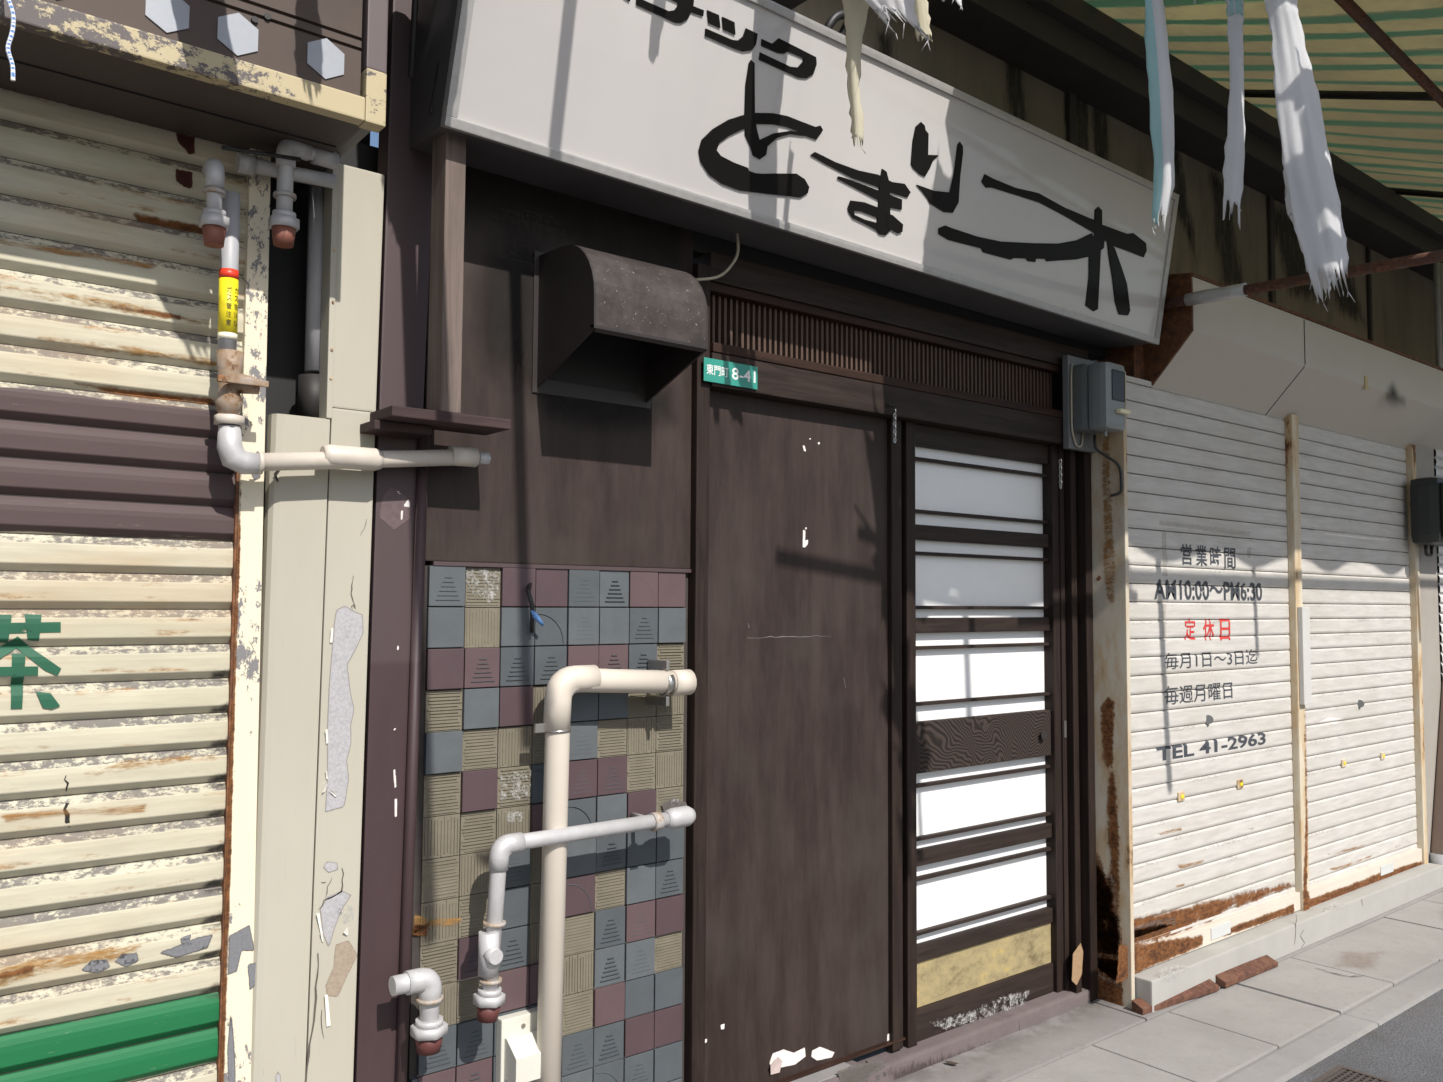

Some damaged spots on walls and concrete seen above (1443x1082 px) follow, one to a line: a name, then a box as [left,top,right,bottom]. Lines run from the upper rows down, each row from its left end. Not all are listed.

rust [134,214,203,235]
rust [36,246,152,268]
rust [31,290,187,319]
rust [66,339,216,366]
rust [76,383,215,404]
peeling [322,606,363,812]
rust [2,811,66,820]
rust [1096,697,1422,1015]
rust [0,947,135,985]
spalling [316,891,357,1037]